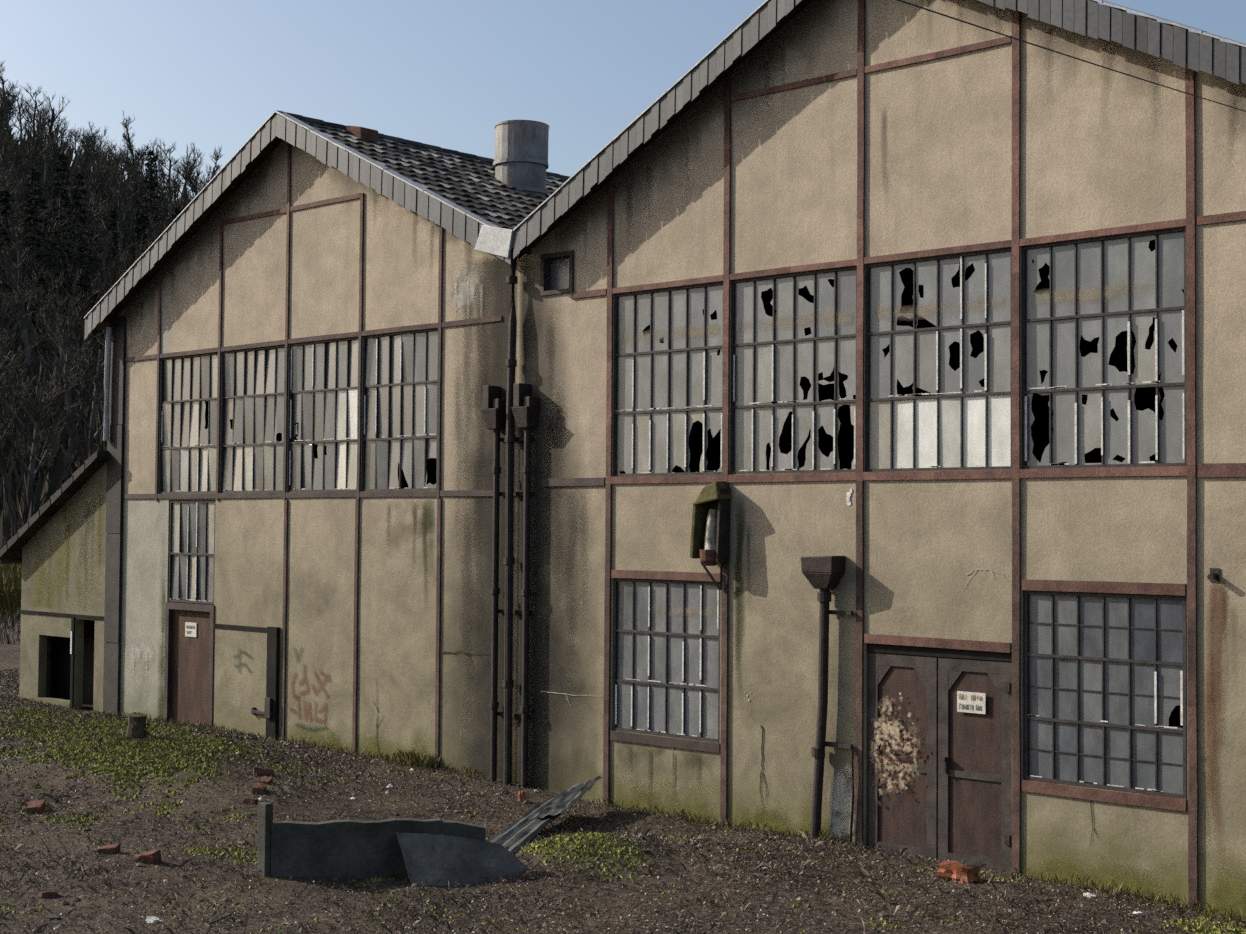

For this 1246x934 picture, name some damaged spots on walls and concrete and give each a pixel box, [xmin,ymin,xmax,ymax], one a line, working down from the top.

leakage [413,507,433,557]
leakage [464,258,576,789]
corrosion [1207,587,1224,711]
peeling [830,765,852,840]
peeling [870,693,930,806]